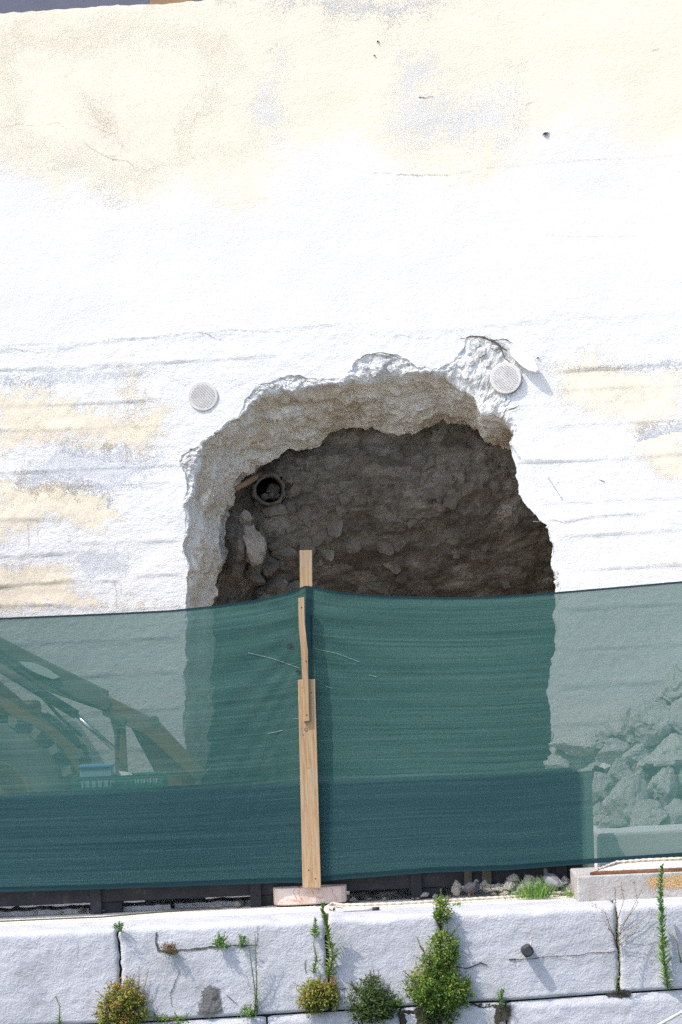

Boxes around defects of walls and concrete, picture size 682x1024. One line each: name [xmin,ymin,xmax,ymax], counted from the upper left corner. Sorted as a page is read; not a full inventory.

spalling [0,336,682,617]
crack [127,922,258,1005]